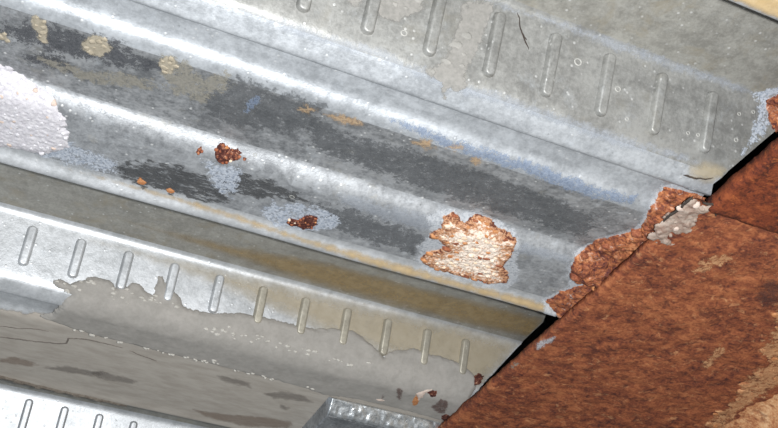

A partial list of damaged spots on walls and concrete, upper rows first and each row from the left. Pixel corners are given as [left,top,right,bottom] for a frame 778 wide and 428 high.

damp [0,20,638,256]
corrosion [196,143,247,199]
corrosion [238,196,341,239]
peeling [631,191,705,244]
corrosion [315,183,706,317]
peeling [569,251,606,282]
corrosion [693,254,732,274]
damp [0,276,477,428]
corrosion [703,280,778,428]